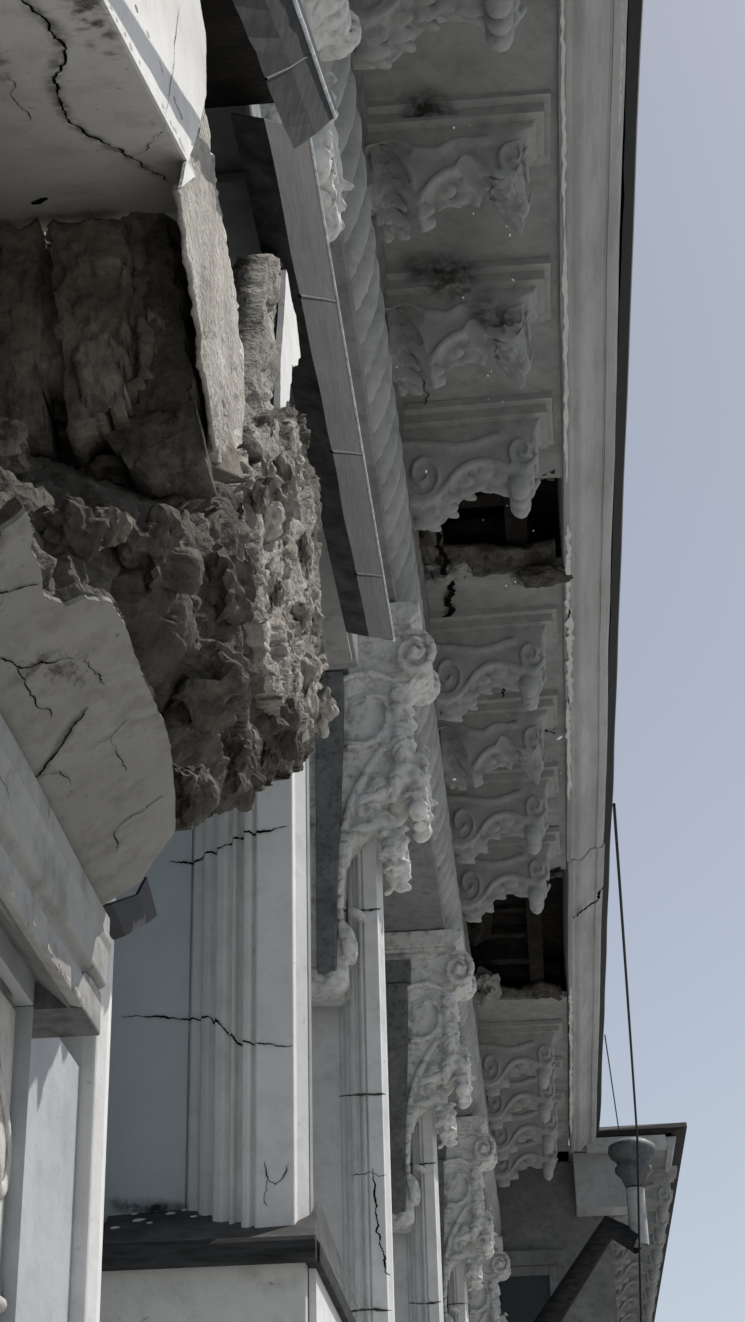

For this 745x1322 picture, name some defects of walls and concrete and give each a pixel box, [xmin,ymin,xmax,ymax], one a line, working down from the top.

spalling [0,96,339,832]
spalling [47,944,85,1005]